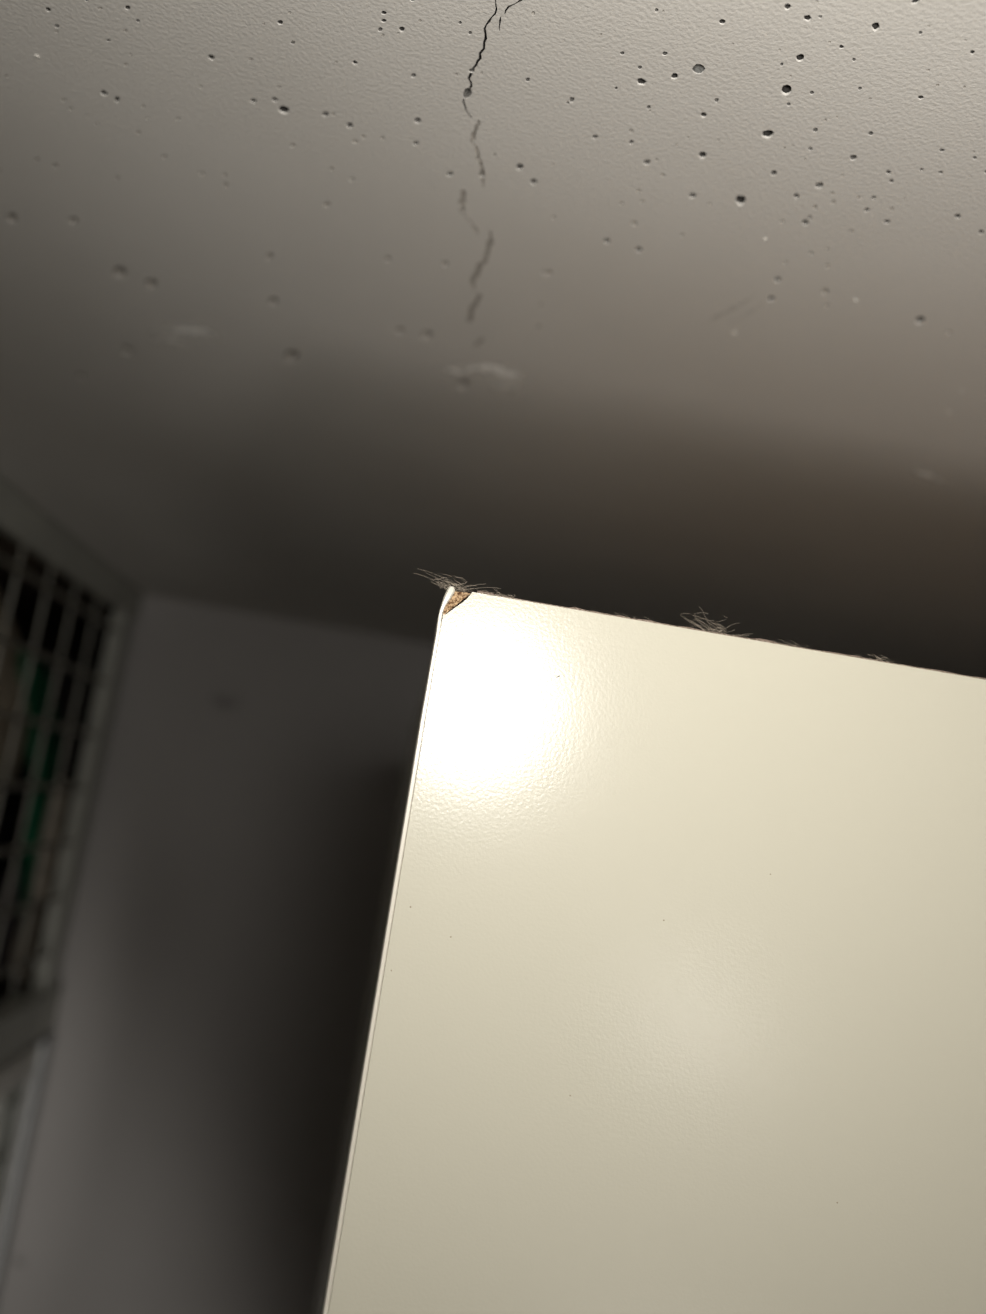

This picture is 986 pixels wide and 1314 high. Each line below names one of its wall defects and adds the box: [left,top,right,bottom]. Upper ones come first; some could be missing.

crack [458,0,522,347]